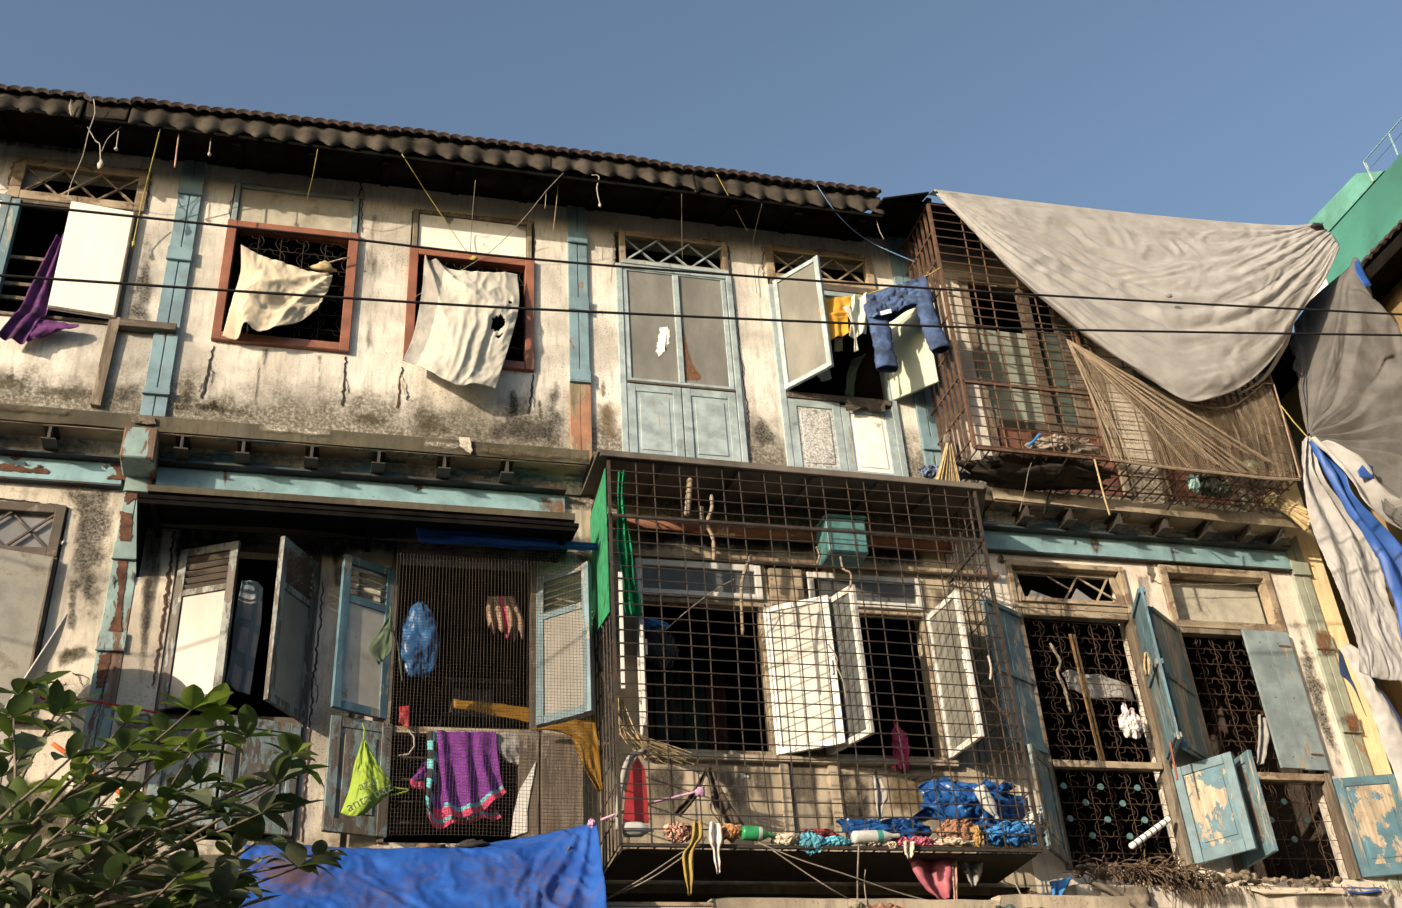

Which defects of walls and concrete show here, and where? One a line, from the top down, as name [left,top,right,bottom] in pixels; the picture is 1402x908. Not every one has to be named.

crack [199,346,214,398]
crack [340,356,349,406]
damp [493,385,560,442]
peeling [0,455,50,474]
damp [67,489,109,627]
crack [151,531,176,686]
damp [59,647,86,665]
peeling [96,653,115,688]
crack [300,581,324,842]
damp [1301,640,1336,749]